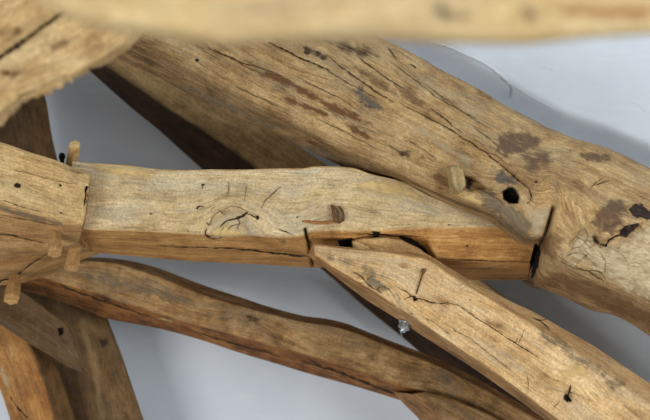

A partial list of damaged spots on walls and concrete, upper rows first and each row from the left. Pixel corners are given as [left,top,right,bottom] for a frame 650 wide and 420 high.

crack [207,46,361,113]
crack [268,42,532,203]
crack [153,209,307,257]
crack [561,227,629,282]
crack [354,272,537,386]